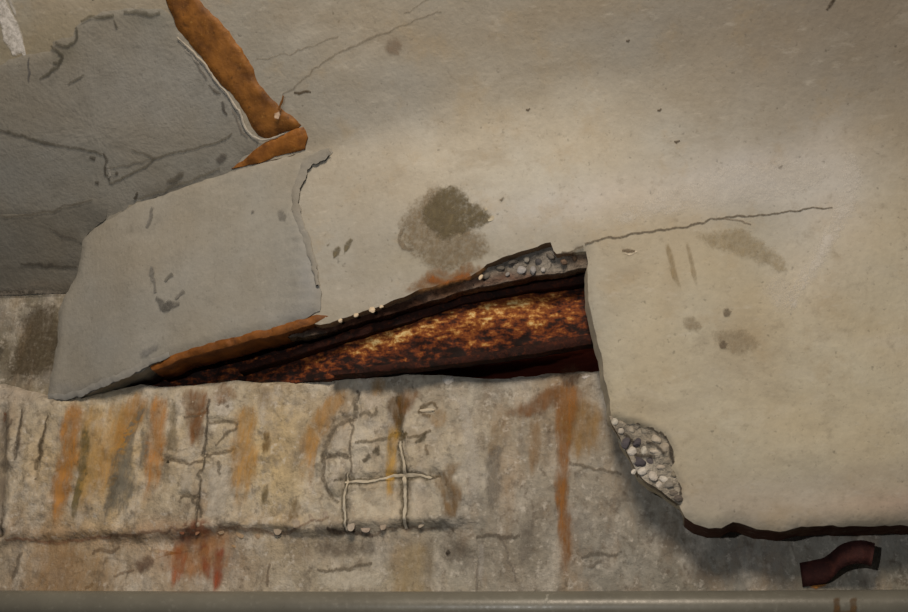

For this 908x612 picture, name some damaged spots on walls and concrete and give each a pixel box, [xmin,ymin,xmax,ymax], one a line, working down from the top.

corrosion [166,0,308,169]
water stain [398,185,490,270]
crack [562,207,833,253]
spalling [149,266,185,311]
spalling [288,247,588,342]
corrosion [150,315,328,380]
corrosion [331,334,593,379]
crack [0,399,238,576]
crack [228,391,440,537]
corrosion [520,369,579,551]
spalling [609,416,684,506]
crack [319,562,372,573]